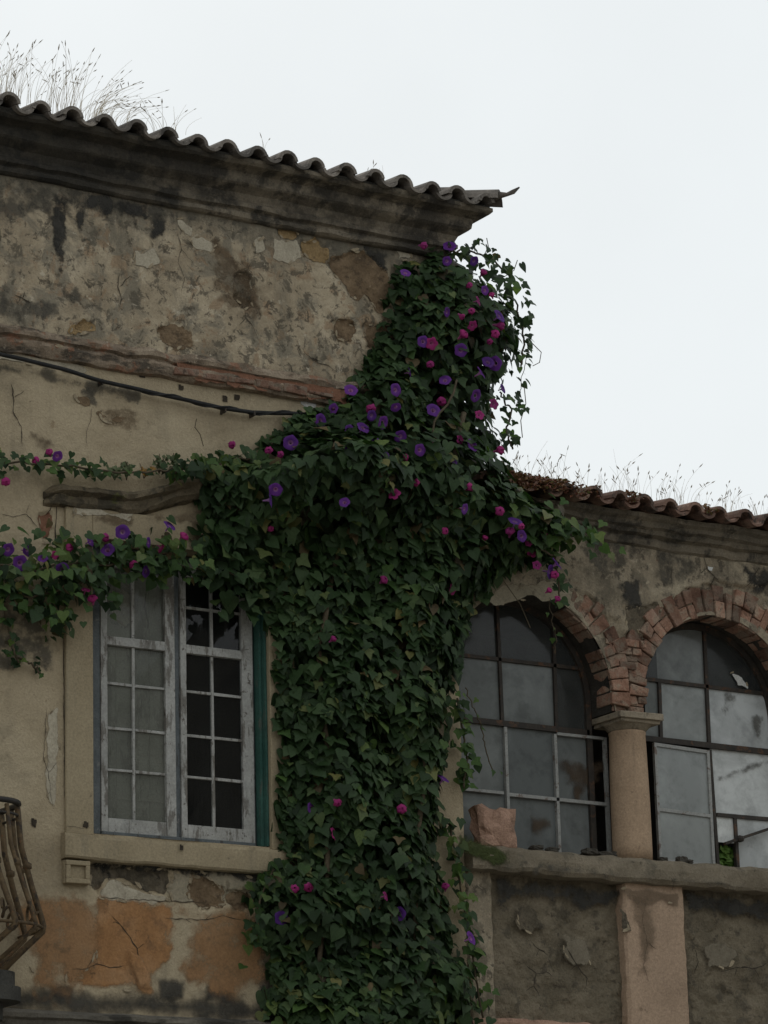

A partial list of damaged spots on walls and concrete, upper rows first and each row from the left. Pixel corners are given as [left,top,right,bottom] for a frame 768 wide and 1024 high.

damp [0,188,166,271]
spalling [253,229,394,348]
spalling [157,324,194,351]
peeling [45,707,61,804]
peeling [19,863,265,995]
crack [82,897,241,970]
spalling [563,934,591,965]
spalling [705,943,737,969]